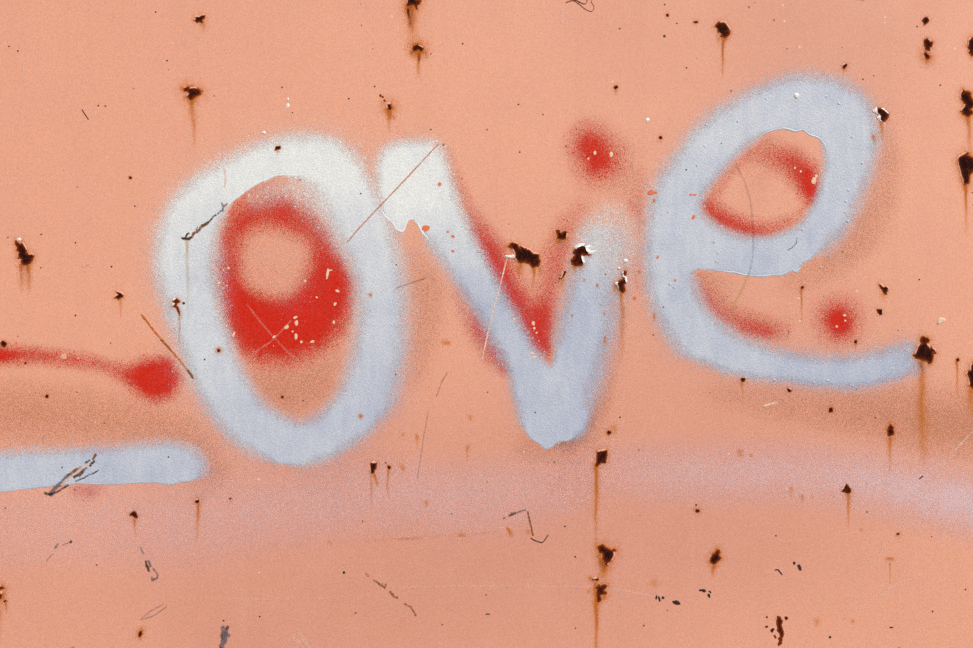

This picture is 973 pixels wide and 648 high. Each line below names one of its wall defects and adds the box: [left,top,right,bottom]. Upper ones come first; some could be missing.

corrosion [406,0,425,68]
corrosion [714,21,731,64]
corrosion [181,85,203,127]
corrosion [873,106,889,140]
corrosion [959,88,973,129]
corrosion [956,151,973,211]
corrosion [15,238,35,277]
corrosion [505,242,541,275]
corrosion [556,229,597,279]
corrosion [913,336,937,434]
corrosion [594,449,608,515]
corrosion [588,544,617,646]